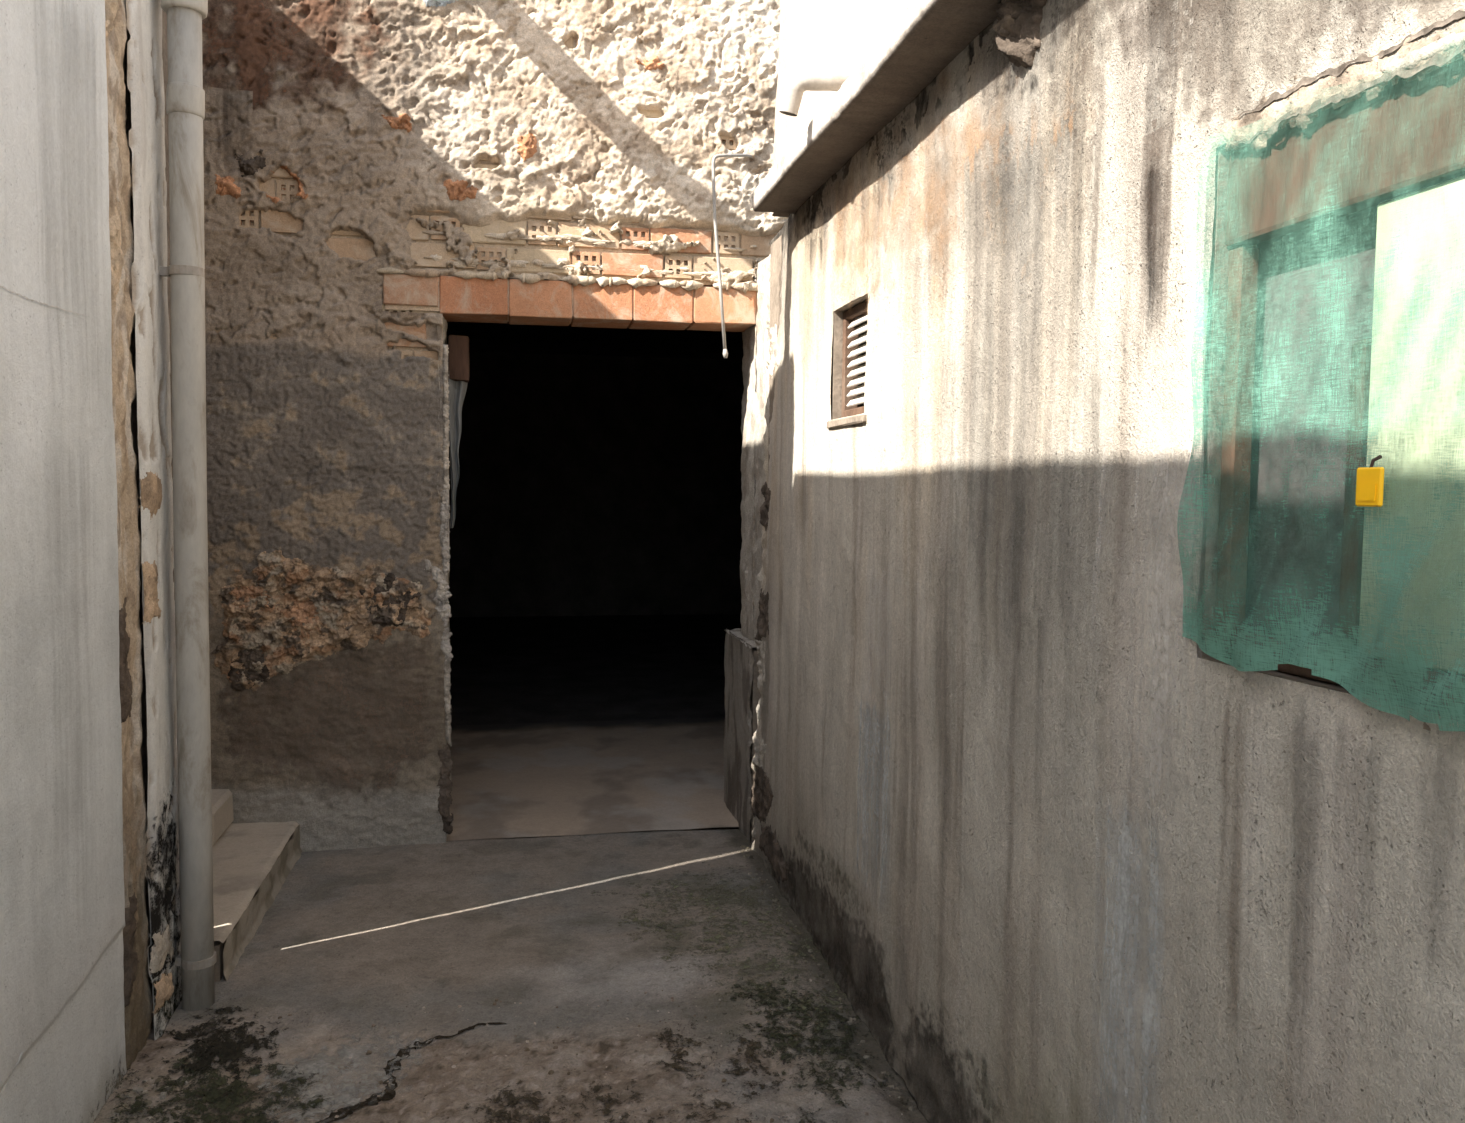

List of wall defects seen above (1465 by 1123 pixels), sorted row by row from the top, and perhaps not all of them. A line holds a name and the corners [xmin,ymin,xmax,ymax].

flaking render [382,113,412,132]
flaking render [443,179,478,201]
flaking render [517,132,542,161]
flaking render [636,56,665,71]
flaking render [1223,10,1465,152]
flaking render [212,345,453,834]
leakage [146,794,182,1038]
leakage [771,843,989,1123]
crack [317,1022,507,1123]